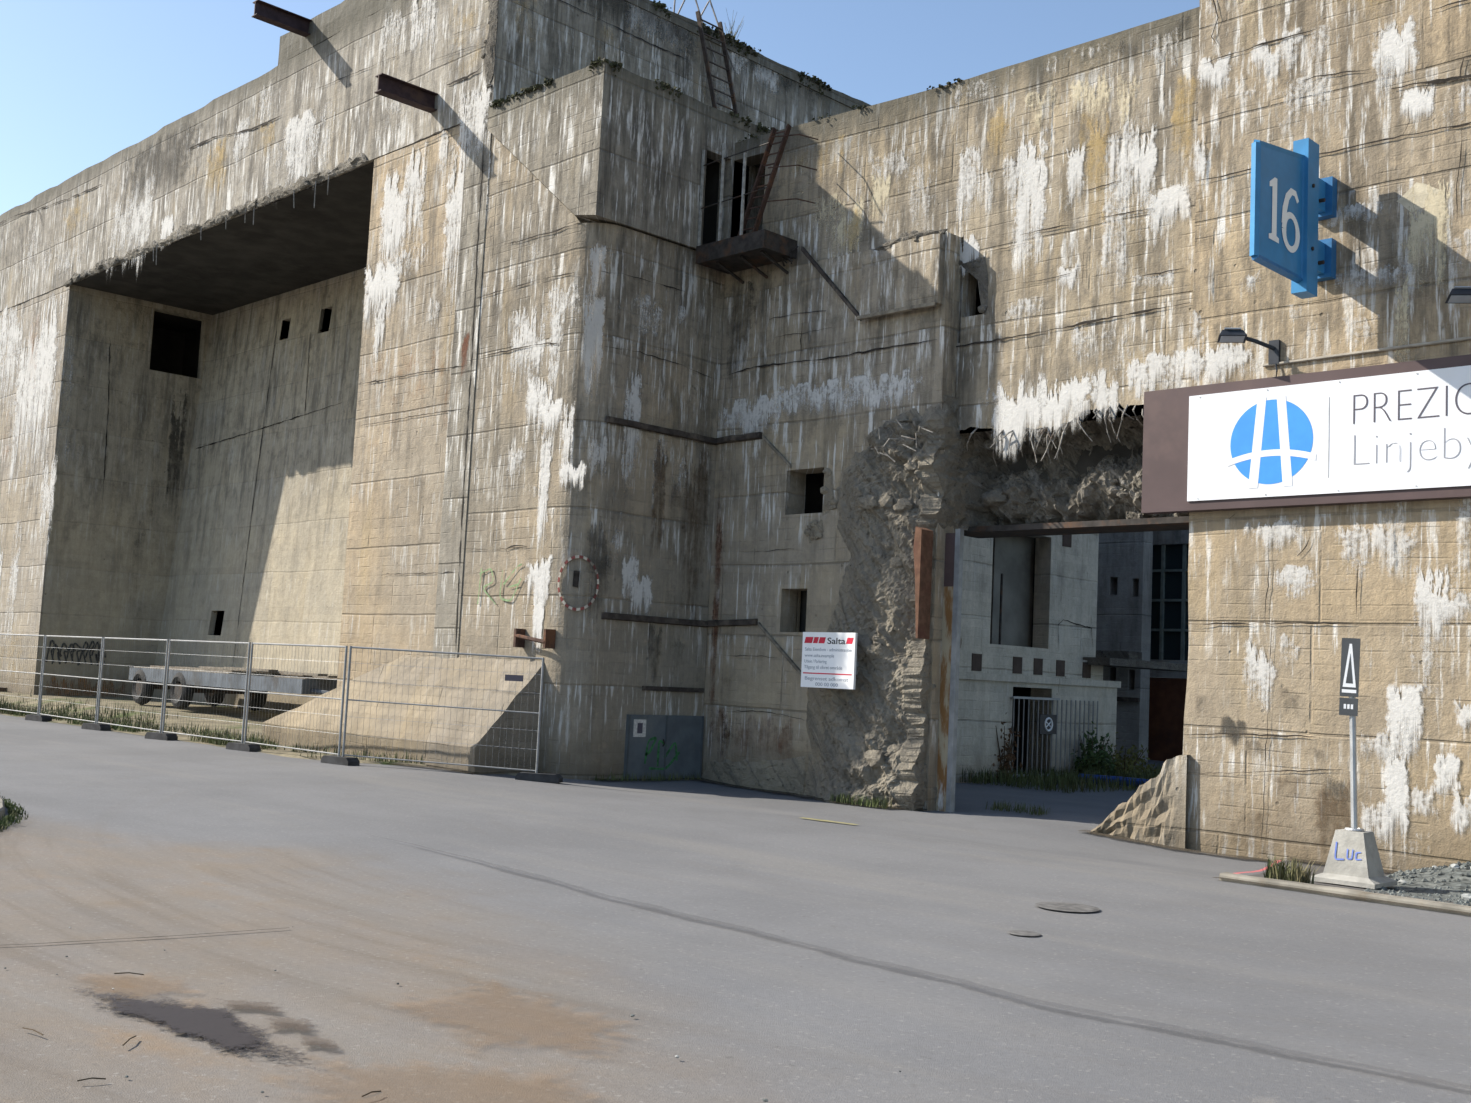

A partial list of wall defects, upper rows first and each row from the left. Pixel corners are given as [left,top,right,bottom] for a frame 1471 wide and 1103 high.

water stain [1198,52,1231,88]
water stain [1251,26,1332,119]
water stain [1372,16,1435,119]
water stain [108,125,197,271]
water stain [1330,180,1471,354]
water stain [0,295,73,545]
water stain [511,244,642,650]
water stain [986,312,1253,456]
spalling [701,395,1189,811]
water stain [1339,524,1414,573]
water stain [1413,498,1471,665]
water stain [1317,684,1471,851]